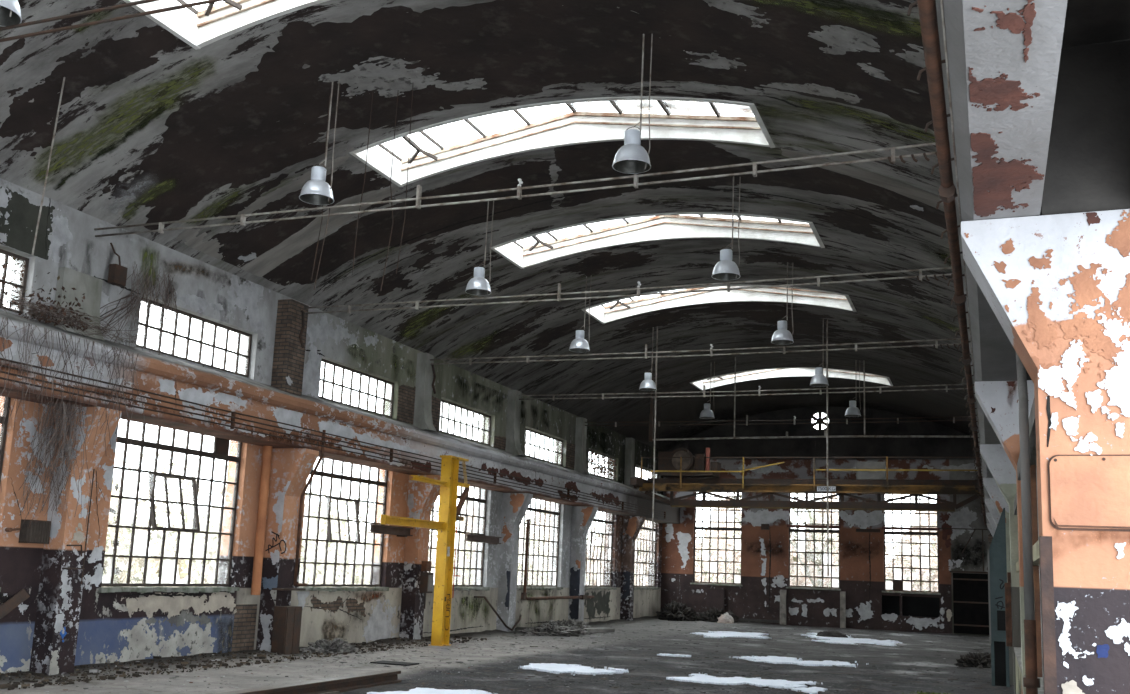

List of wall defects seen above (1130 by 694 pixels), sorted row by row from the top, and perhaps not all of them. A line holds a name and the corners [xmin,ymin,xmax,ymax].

peeling [972,0,1036,63]
peeling [0,25,178,159]
peeling [969,67,1040,112]
peeling [96,0,950,398]
peeling [971,132,1044,217]
peeling [1105,210,1130,257]
peeling [991,238,1130,456]
peeling [155,379,268,437]
peeling [18,418,118,675]
peeling [95,550,280,664]
peeling [742,509,952,630]
peeling [1055,598,1130,668]